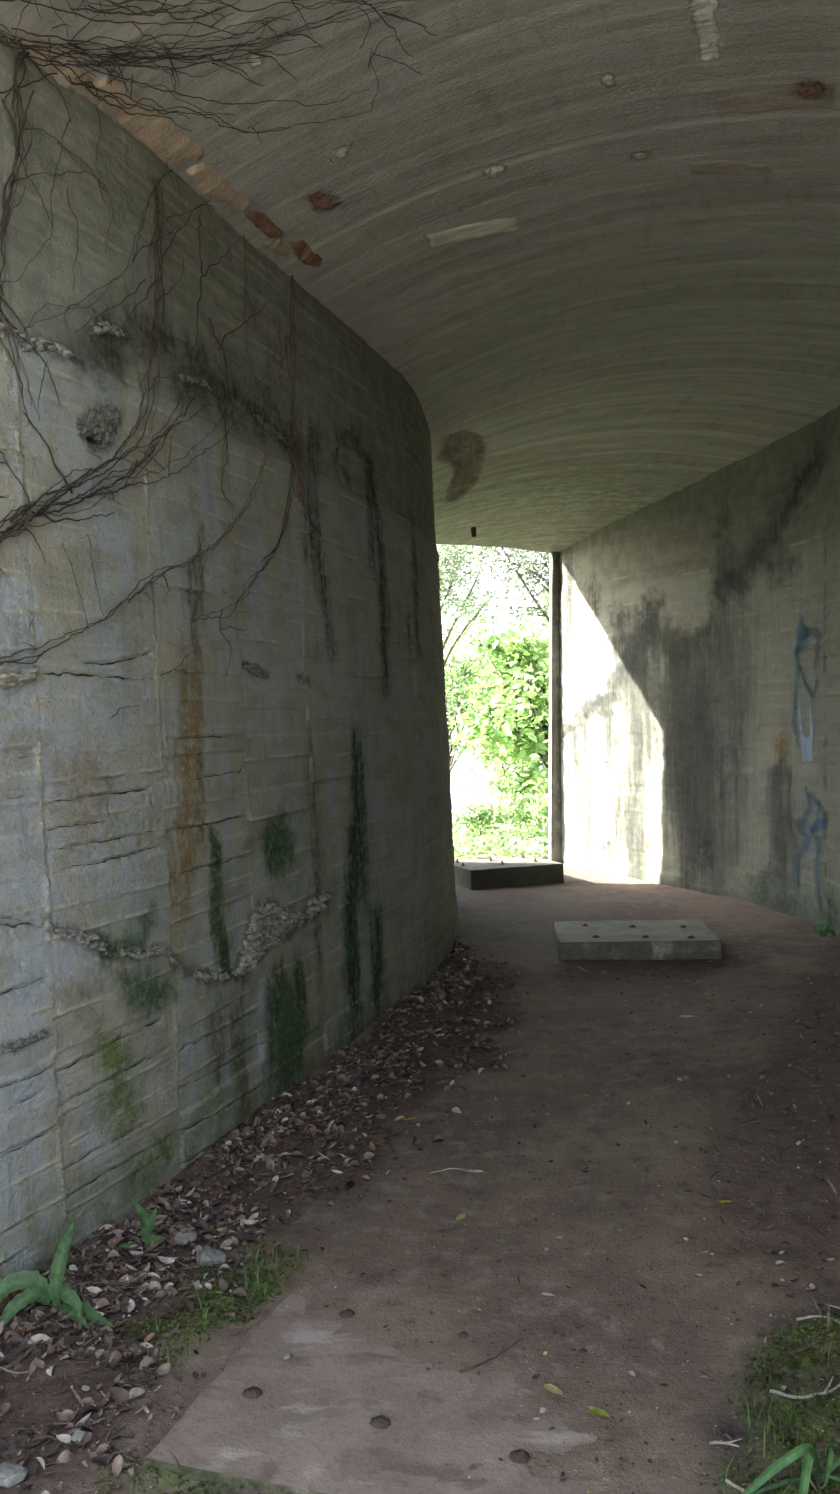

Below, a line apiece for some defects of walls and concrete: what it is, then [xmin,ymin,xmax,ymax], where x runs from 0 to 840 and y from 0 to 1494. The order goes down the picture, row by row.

spalling [690,0,719,60]
rust [177,646,204,883]
water stain [559,450,821,908]
crack [0,917,42,929]